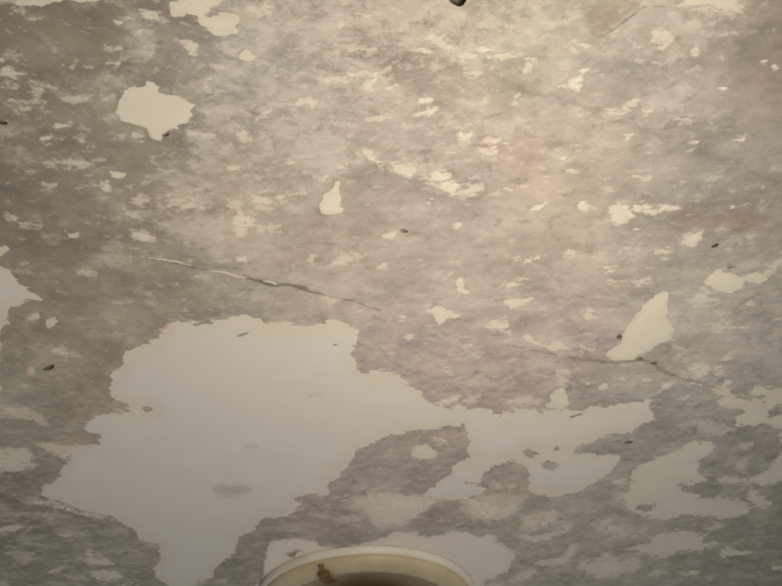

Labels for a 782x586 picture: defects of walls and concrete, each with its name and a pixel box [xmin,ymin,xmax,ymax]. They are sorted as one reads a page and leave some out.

peeling [0,0,62,21]
peeling [113,9,160,25]
peeling [168,0,239,36]
peeling [102,81,215,143]
peeling [317,175,344,215]
peeling [681,229,704,247]
crack [148,257,381,311]
peeling [685,260,782,308]
peeling [0,266,43,362]
peeling [425,306,460,325]
peeling [605,291,682,365]
peeling [0,313,782,586]